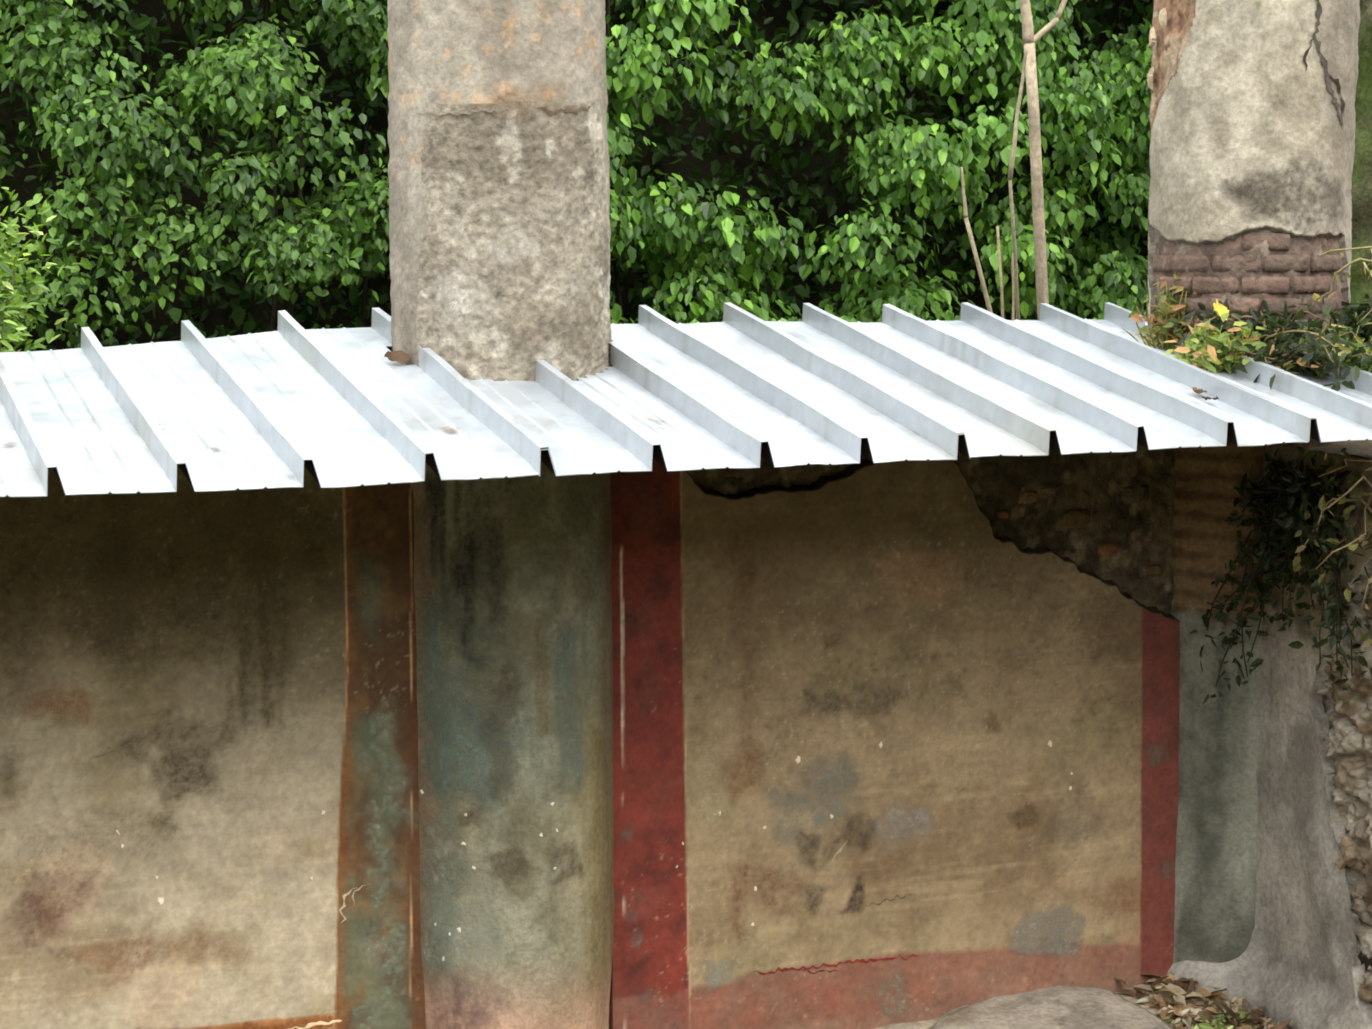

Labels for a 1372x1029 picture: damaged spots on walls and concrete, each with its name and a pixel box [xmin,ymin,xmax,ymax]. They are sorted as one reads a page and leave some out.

crack [1303,0,1345,127]
flaking render [951,443,1180,623]